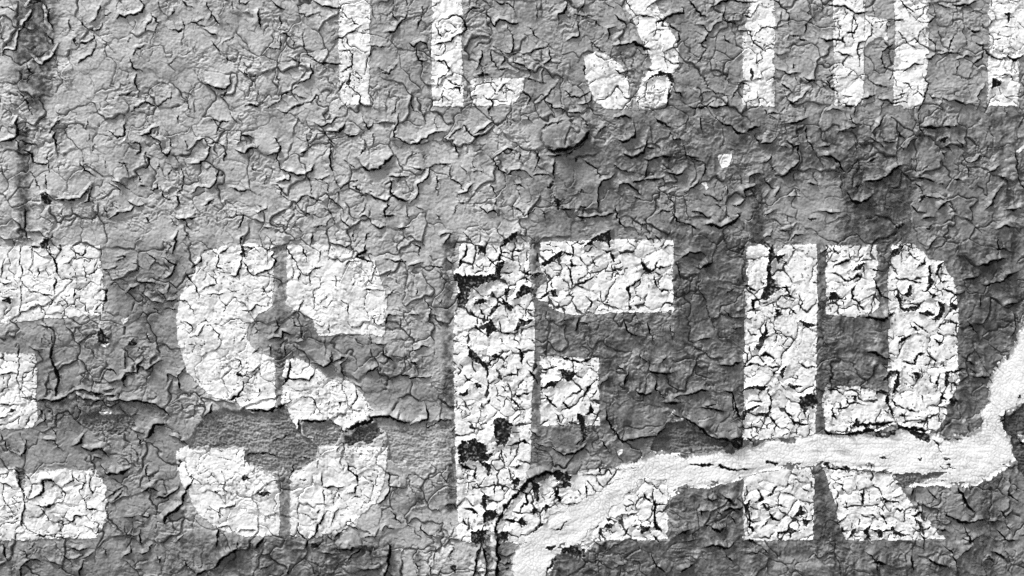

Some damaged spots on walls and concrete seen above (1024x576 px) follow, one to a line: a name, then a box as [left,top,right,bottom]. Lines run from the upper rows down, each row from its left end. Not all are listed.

crack [773,0,1023,215]
crack [0,0,847,476]
peeling [447,228,566,338]
peeling [761,245,788,317]
peeling [894,261,958,322]
peeling [456,342,503,397]
peeling [738,361,821,420]
crack [720,269,990,469]
peeling [467,462,574,572]
crack [461,429,588,576]
crack [599,463,809,573]
crack [830,468,1024,573]